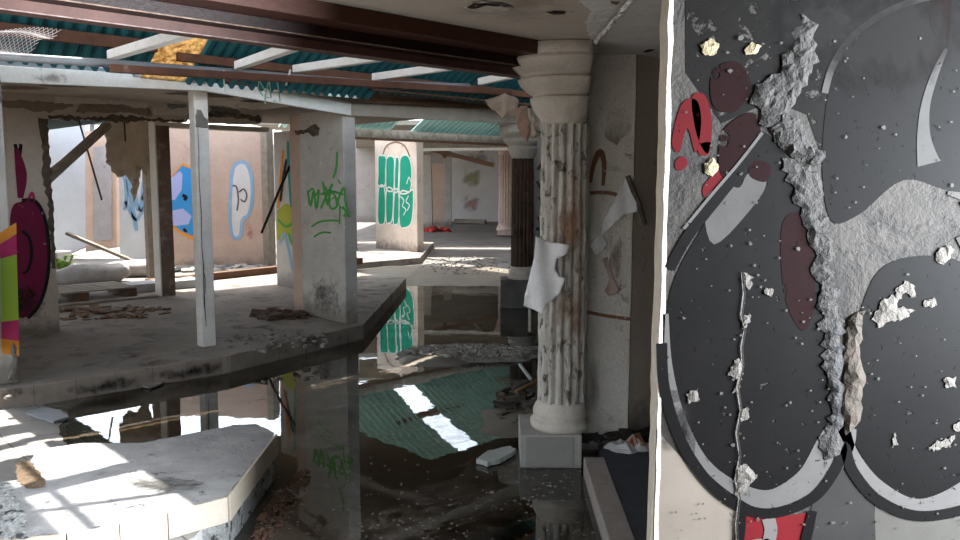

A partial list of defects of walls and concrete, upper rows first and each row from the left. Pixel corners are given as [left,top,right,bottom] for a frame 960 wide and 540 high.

peeling [936,242,955,265]
peeling [851,273,937,328]
peeling [941,371,956,388]
peeling [928,422,960,451]